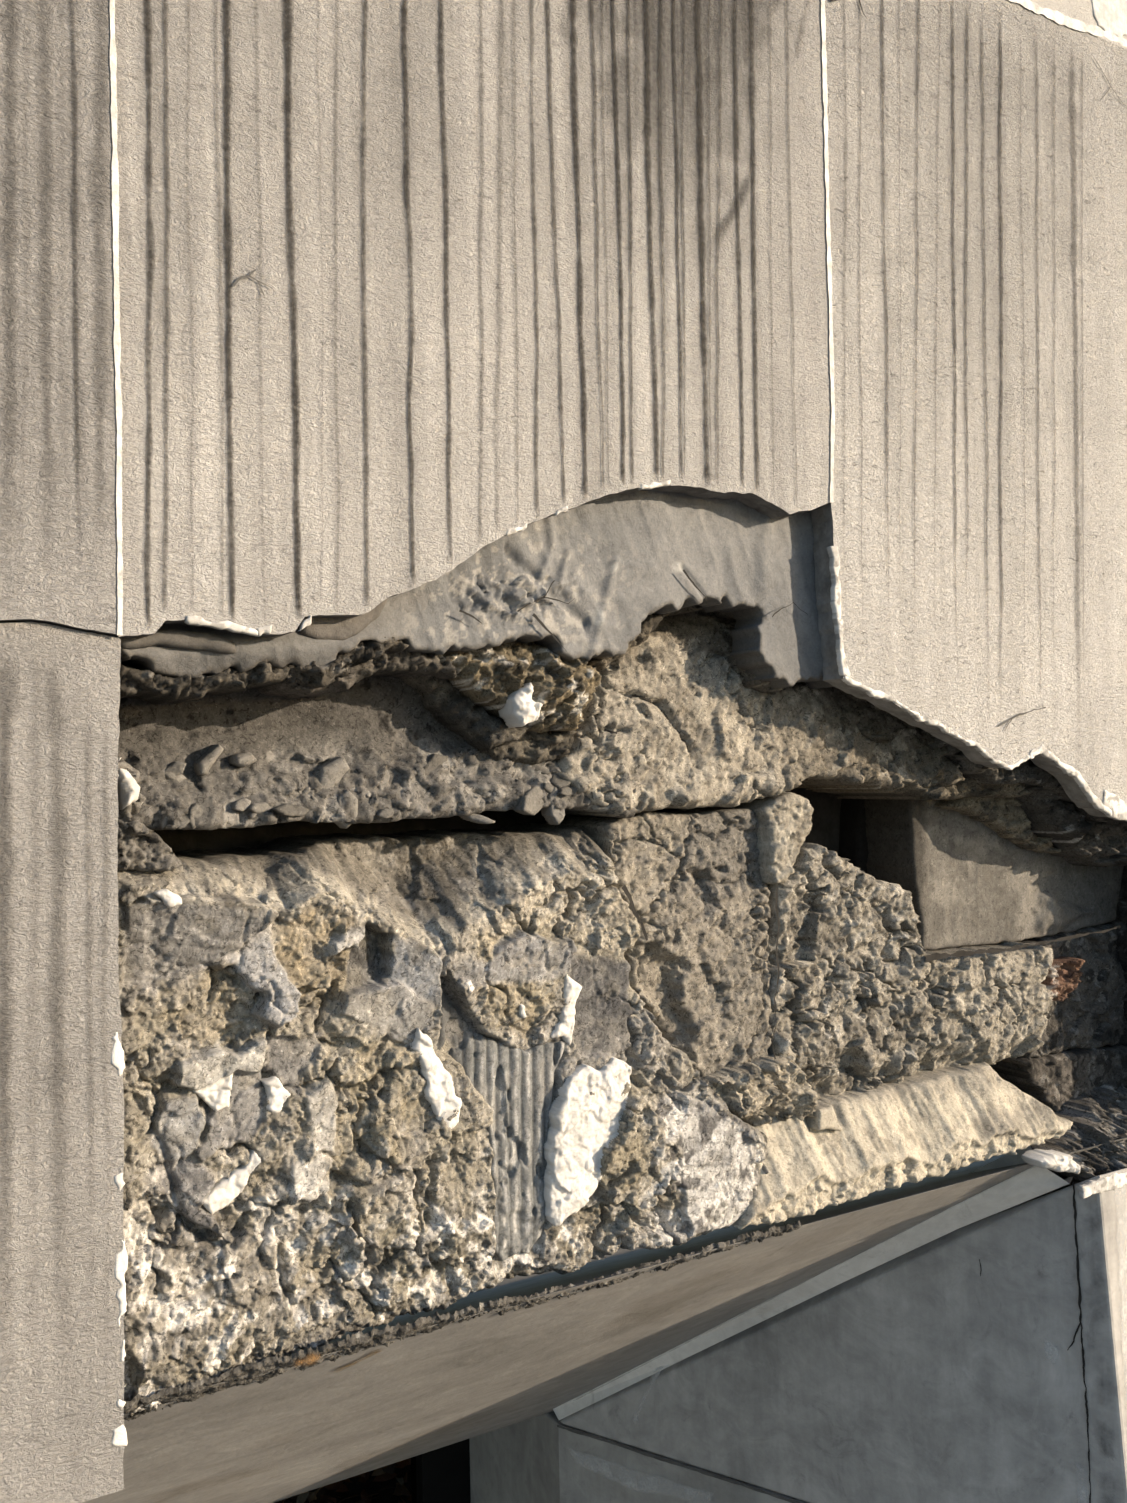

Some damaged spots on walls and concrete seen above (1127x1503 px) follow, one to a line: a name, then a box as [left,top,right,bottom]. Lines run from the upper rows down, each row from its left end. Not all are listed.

crack [233,269,272,296]
spalling [111,480,1127,1447]
crack [557,1273,821,1503]
crack [1068,1182,1091,1503]